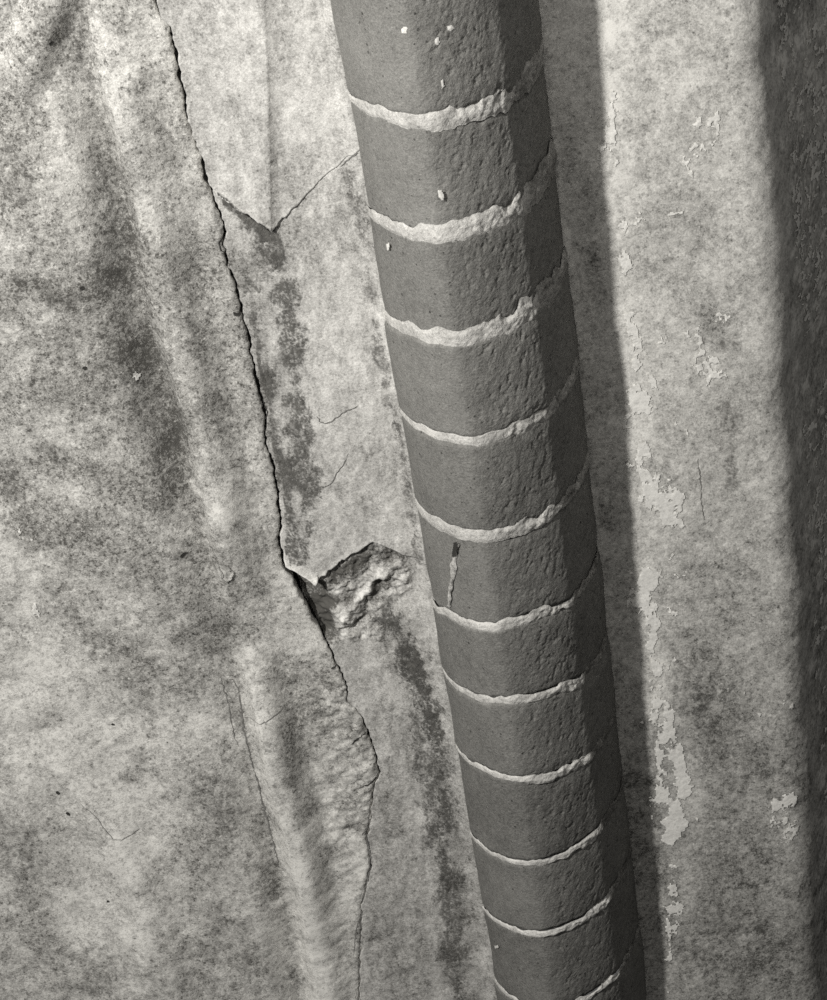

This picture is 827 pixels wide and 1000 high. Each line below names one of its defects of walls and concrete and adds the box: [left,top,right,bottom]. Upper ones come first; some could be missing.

crack [155,0,348,691]
damp [217,192,321,566]
crack [221,679,284,867]
spalling [297,542,414,645]
crack [352,717,380,1000]
damp [373,599,477,1000]
peeling [626,553,698,846]
peeling [768,792,799,840]